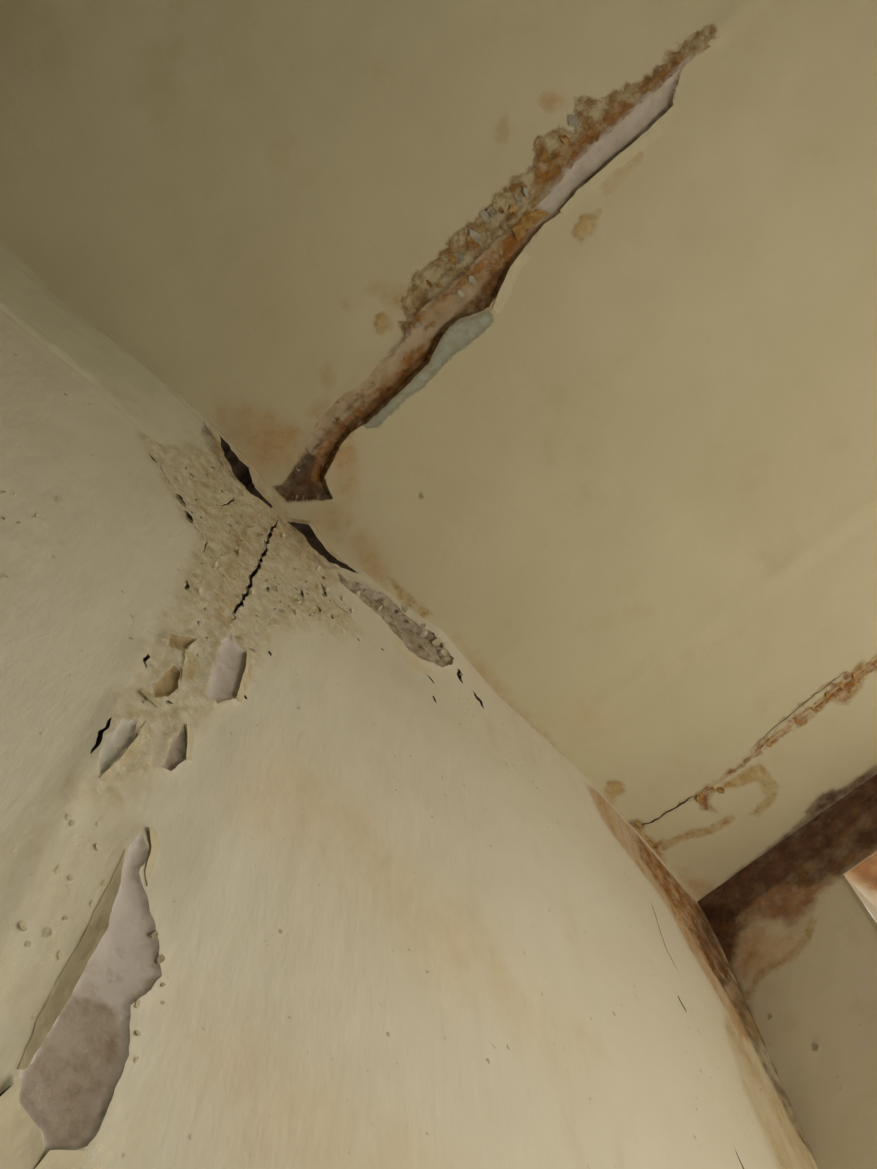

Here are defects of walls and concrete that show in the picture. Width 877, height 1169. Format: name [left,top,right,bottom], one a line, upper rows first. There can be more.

spalling [273,27,716,502]
crack [206,428,357,624]
spalling [90,453,484,781]
peeling [0,827,166,1169]